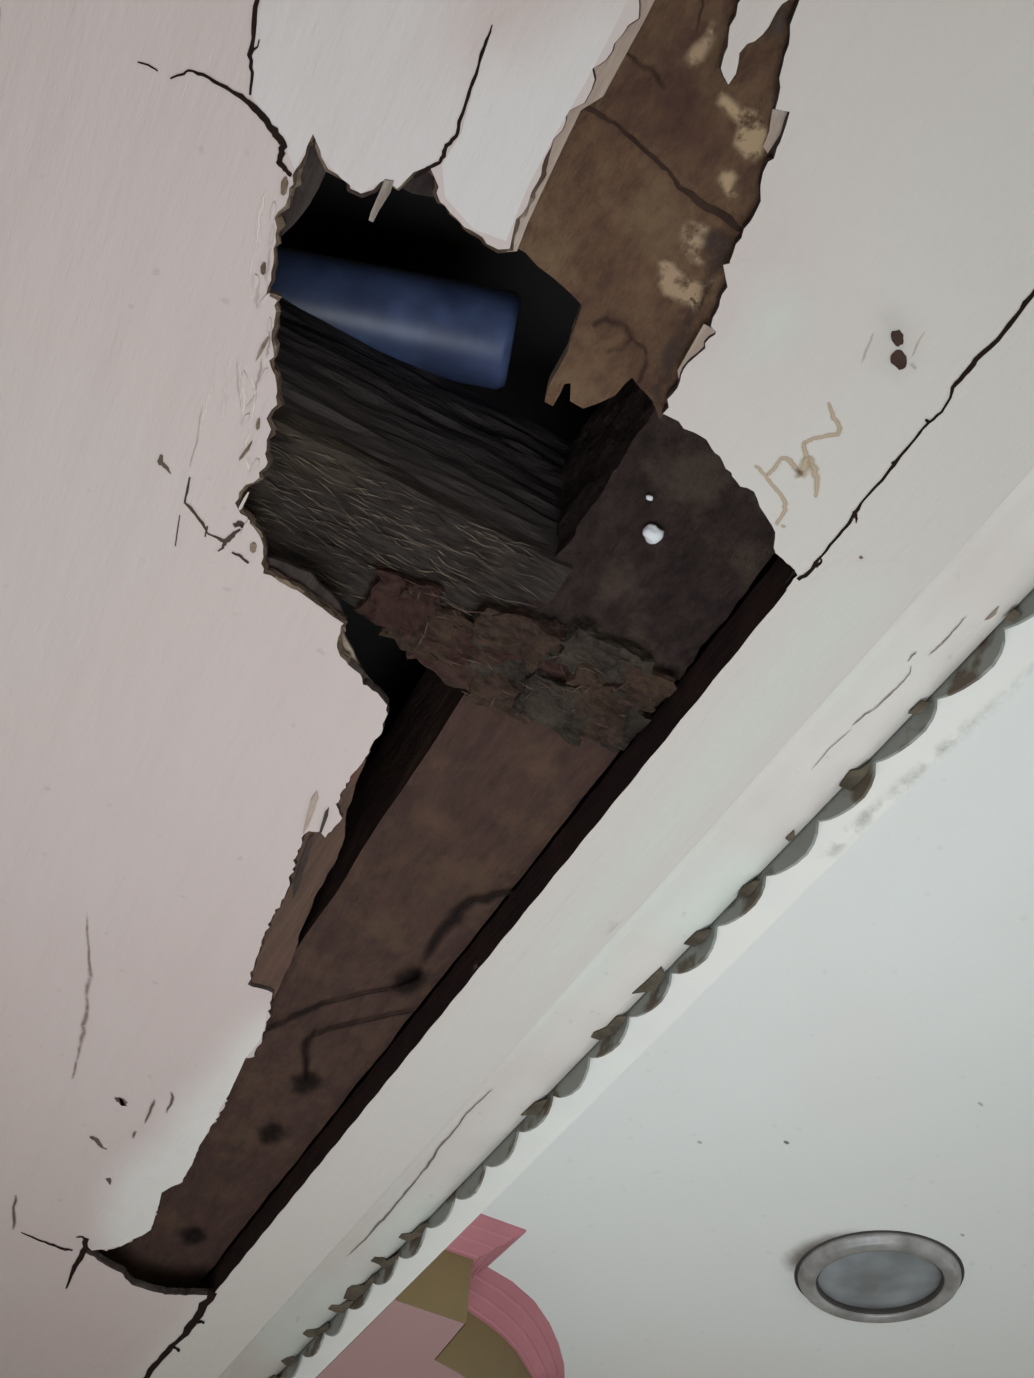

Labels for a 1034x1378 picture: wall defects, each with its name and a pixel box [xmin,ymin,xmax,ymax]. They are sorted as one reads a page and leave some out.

crack [137,0,292,177]
crack [413,25,493,178]
damp [442,0,628,241]
peeling [718,94,788,158]
damp [593,233,840,407]
crack [797,290,1034,581]
crack [175,477,249,564]
spalling [591,1015,627,1040]
spalling [632,966,666,994]
peeling [77,995,270,1250]
crack [144,1292,217,1378]
spalling [303,1222,429,1338]